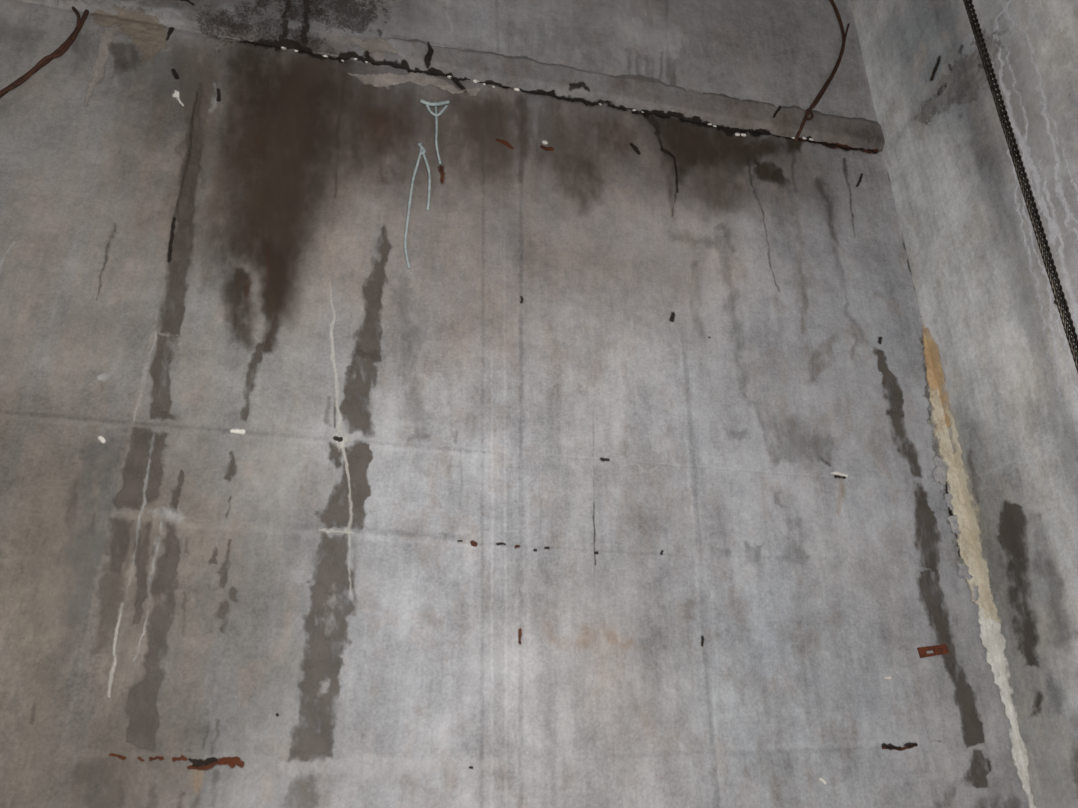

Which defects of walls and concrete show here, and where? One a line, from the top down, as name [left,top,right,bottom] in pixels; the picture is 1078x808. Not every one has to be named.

damp [226,60,344,434]
crack [240,39,877,221]
damp [658,118,802,184]
damp [111,69,202,750]
damp [209,540,236,632]
damp [225,452,235,480]
damp [289,226,391,761]
damp [875,350,991,788]
spalling [921,337,979,602]
damp [923,325,1038,808]
rust [109,753,244,770]
rust [882,742,917,751]